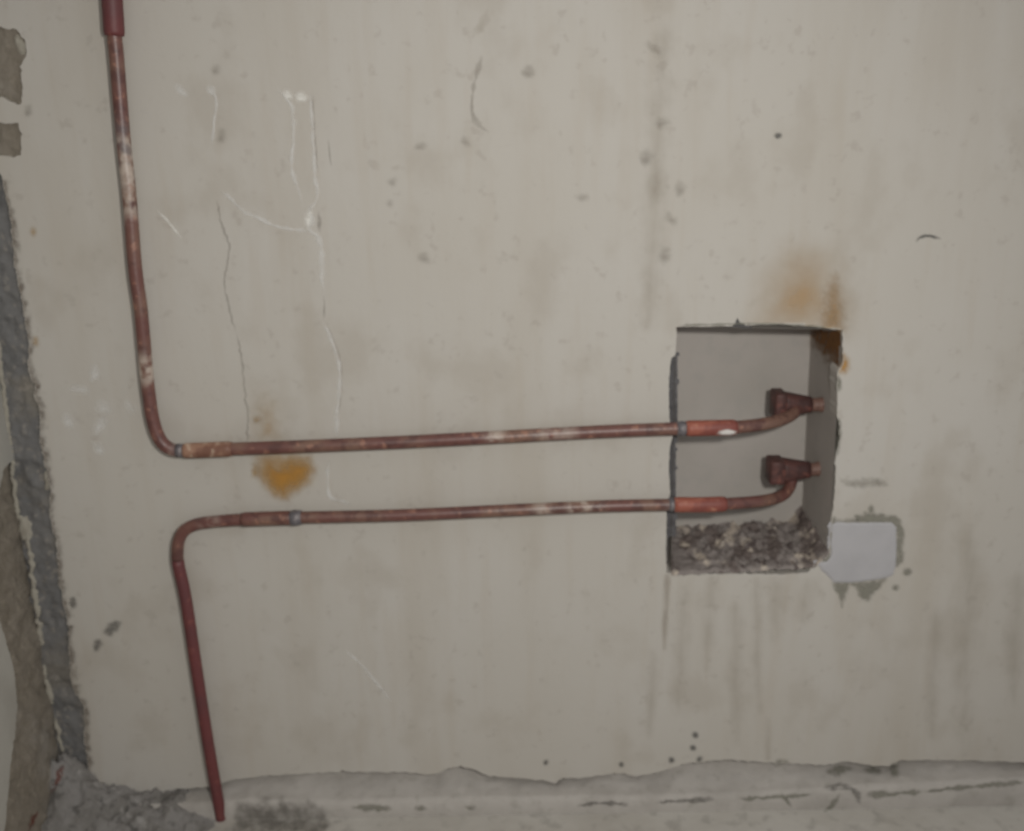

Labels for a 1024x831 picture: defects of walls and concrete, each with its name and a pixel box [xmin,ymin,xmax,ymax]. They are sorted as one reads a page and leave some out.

peeling [0,27,27,105]
peeling [0,122,22,157]
rust [812,304,847,371]
spalling [669,352,679,422]
spalling [0,174,91,831]
rust [255,465,308,493]
spalling [669,435,678,498]
spalling [666,506,832,576]